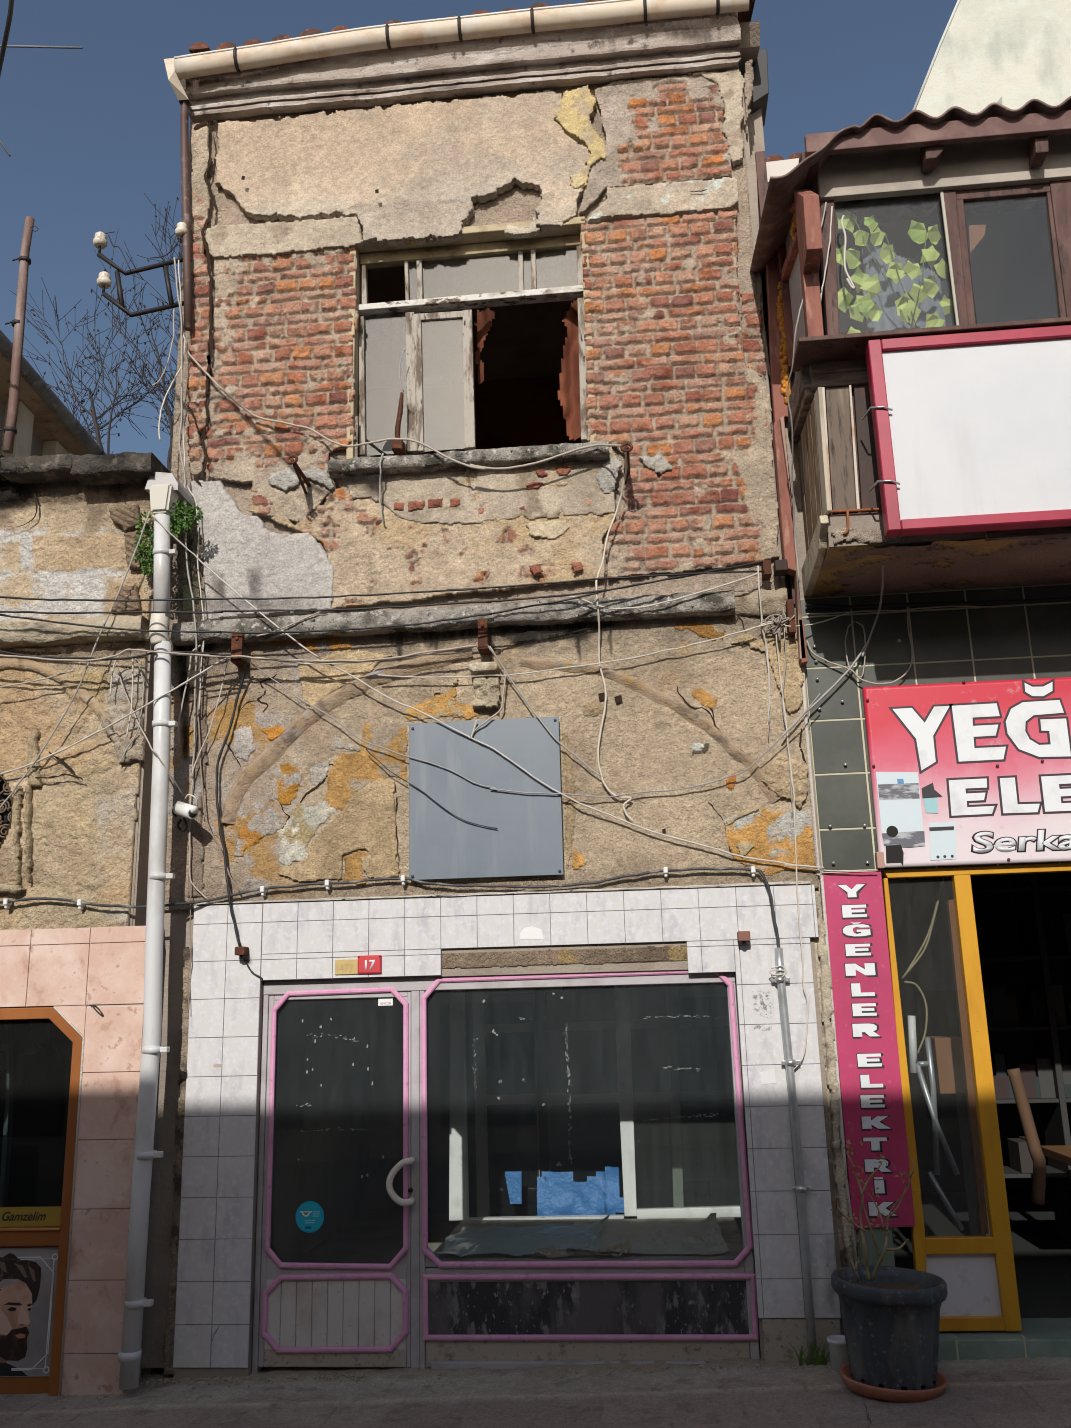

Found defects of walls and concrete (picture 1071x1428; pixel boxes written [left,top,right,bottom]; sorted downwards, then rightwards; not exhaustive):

crack [185,120,217,486]
flaking render [186,72,780,609]
crack [240,674,277,712]
flaking render [264,637,392,707]
flaking render [231,678,479,885]
flaking render [723,754,816,876]